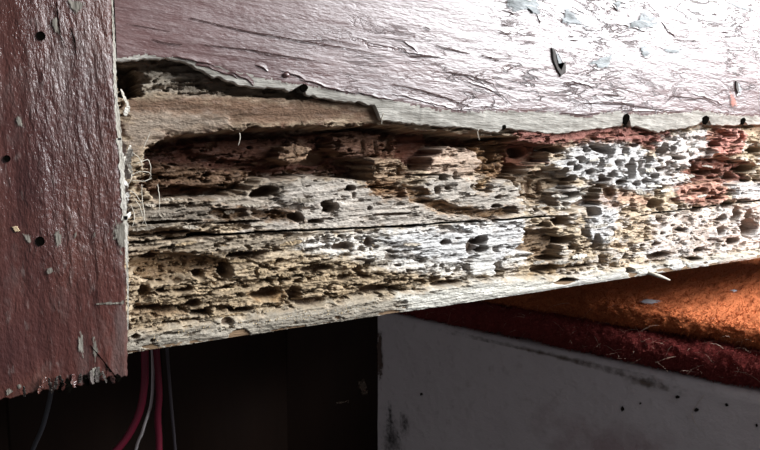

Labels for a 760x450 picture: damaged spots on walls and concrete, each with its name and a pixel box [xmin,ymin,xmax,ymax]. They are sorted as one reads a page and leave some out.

peeling [502,0,546,22]
peeling [560,9,587,28]
peeling [618,12,676,38]
peeling [171,52,254,86]
peeling [280,68,502,112]
peeling [113,143,159,255]
peeling [145,197,187,217]
peeling [635,185,673,195]
crack [641,200,760,216]
crack [133,215,563,239]
peeling [554,253,587,265]